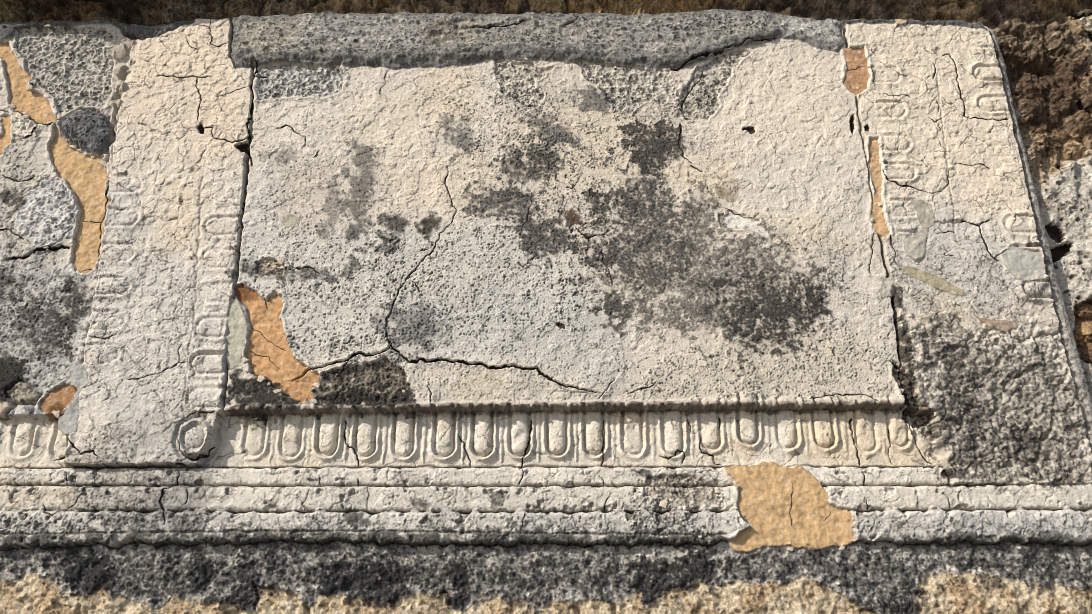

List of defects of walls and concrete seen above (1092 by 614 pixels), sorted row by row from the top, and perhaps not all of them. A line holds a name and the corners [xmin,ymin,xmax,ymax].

spalling [0,24,114,274]
crack [160,21,267,232]
leakage [431,114,475,161]
leakage [572,86,614,112]
crack [882,54,1008,194]
leakage [462,110,835,369]
crack [938,220,1006,268]
peeling [235,285,408,406]
crack [251,167,656,511]
spalling [1073,298,1092,364]
leakage [0,509,1092,614]
peeling [725,461,859,552]